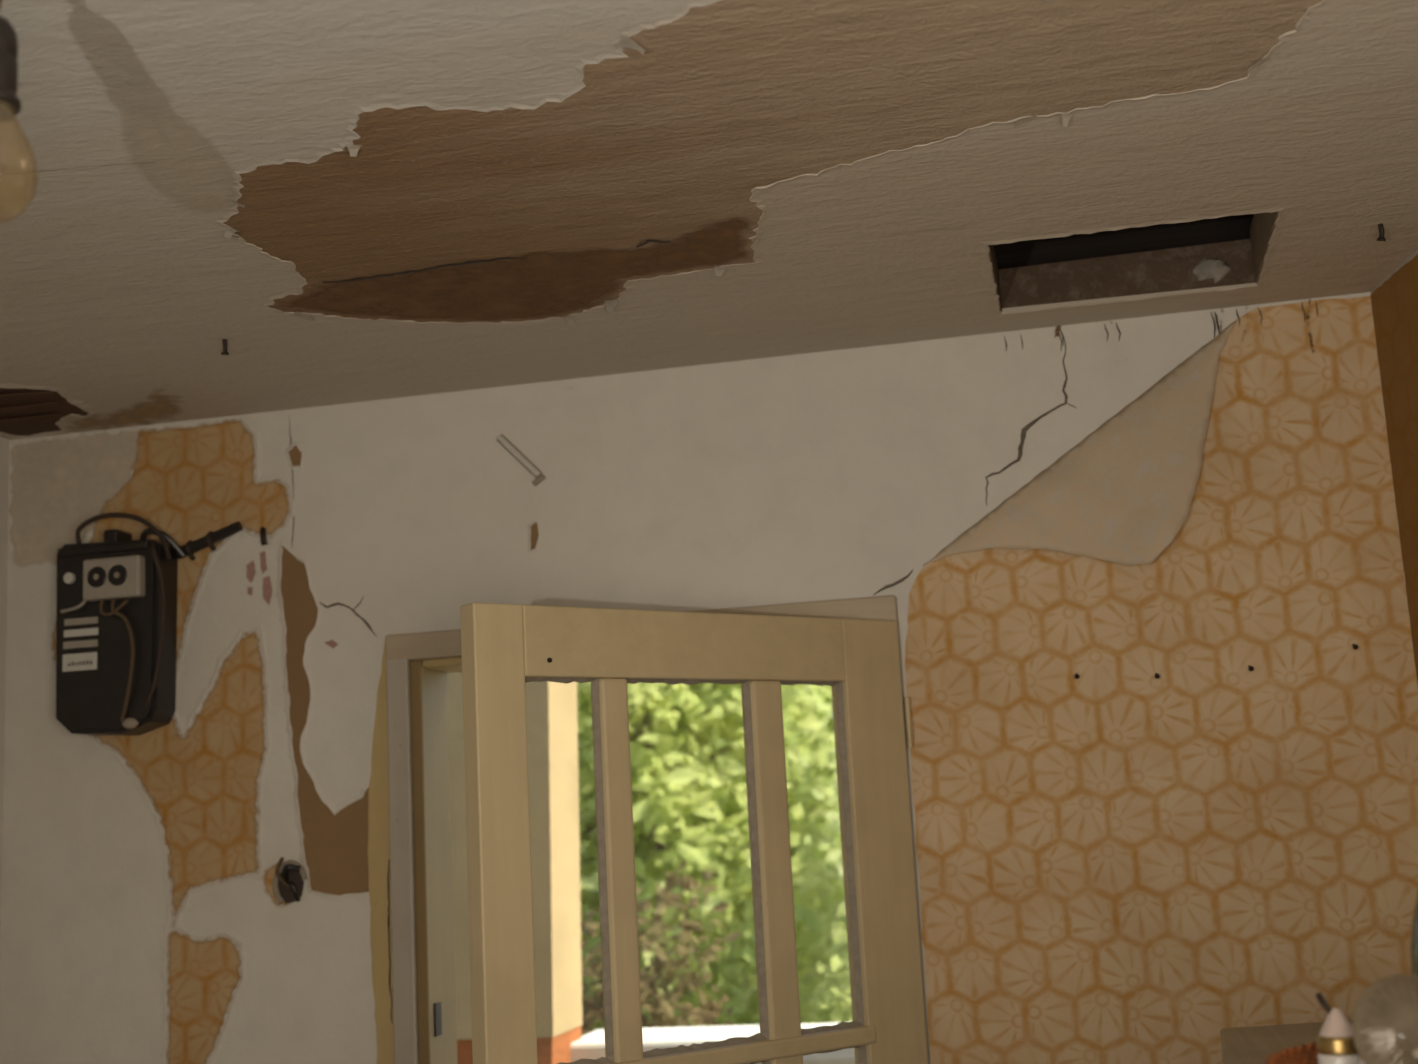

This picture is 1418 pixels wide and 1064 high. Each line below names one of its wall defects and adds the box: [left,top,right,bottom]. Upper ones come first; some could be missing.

flaking render [215,0,1329,325]
crack [985,335,1077,504]
peeling [11,419,369,1064]